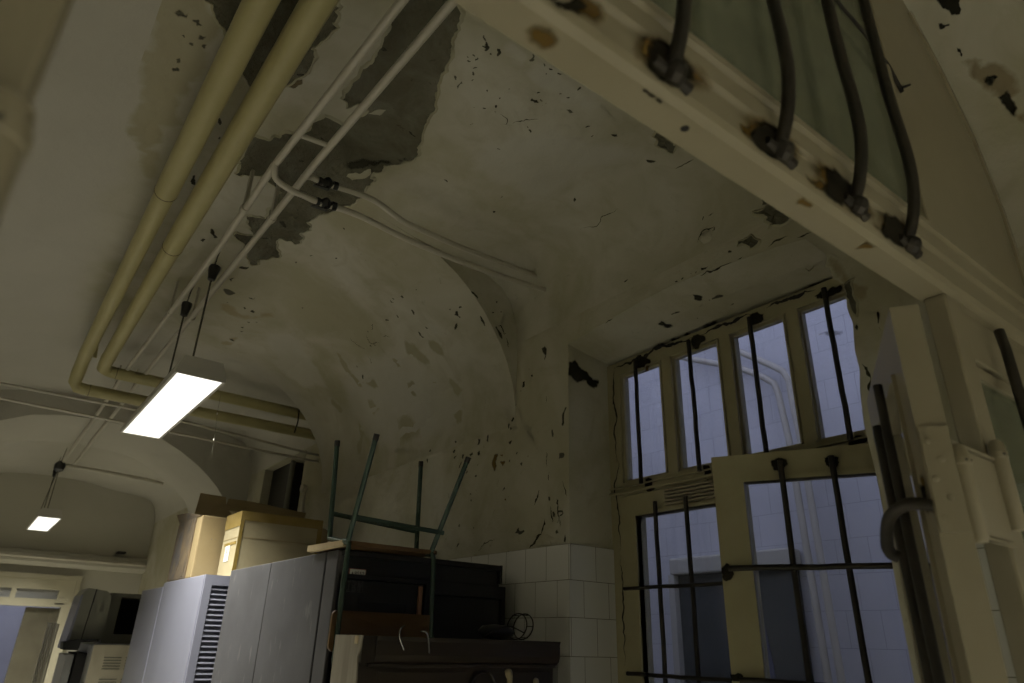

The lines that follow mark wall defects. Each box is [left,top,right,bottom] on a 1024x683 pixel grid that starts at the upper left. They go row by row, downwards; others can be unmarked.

flaking render [202,0,241,36]
rust [529,28,557,49]
rust [639,39,673,85]
flaking render [224,0,501,295]
rust [740,120,777,158]
rust [808,163,851,208]
crack [613,290,814,659]
crack [530,456,566,547]